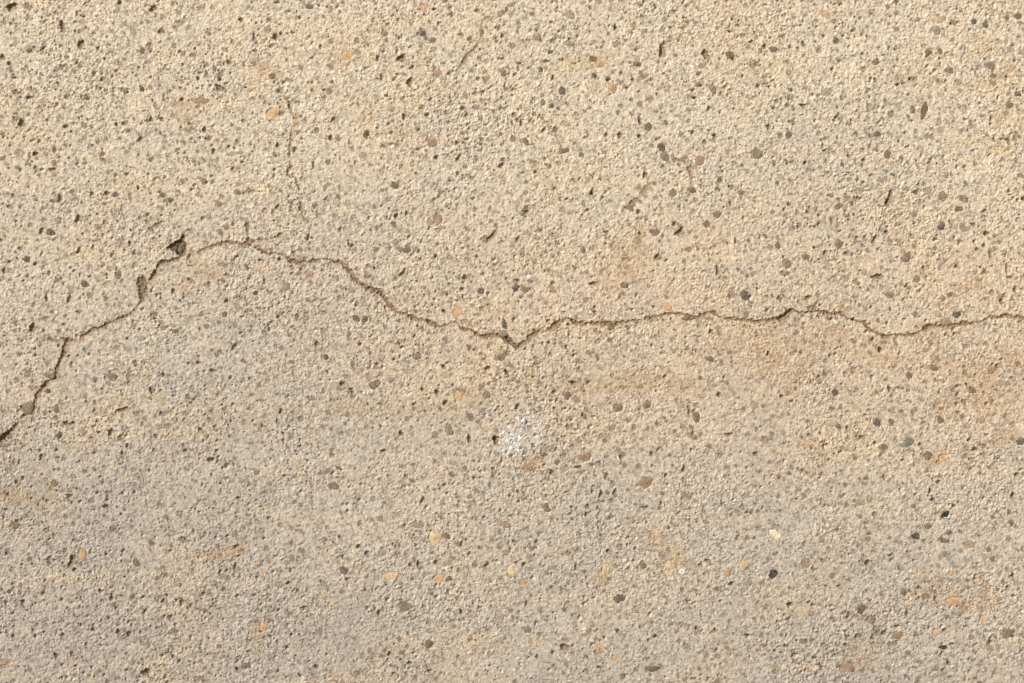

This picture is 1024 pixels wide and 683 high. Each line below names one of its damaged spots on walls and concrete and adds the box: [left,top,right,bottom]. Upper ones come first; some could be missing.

crack [0,223,1024,437]